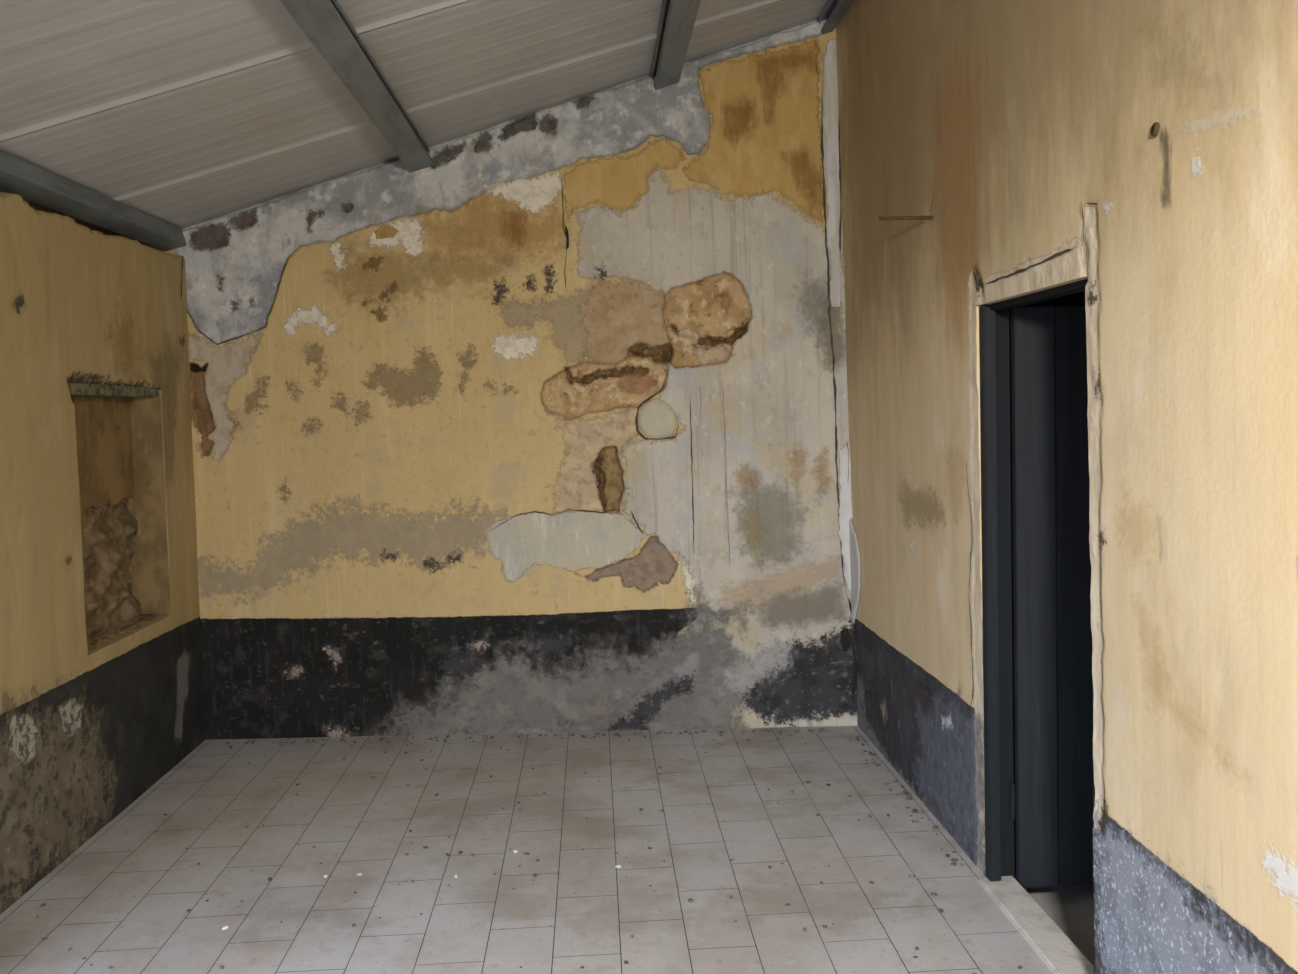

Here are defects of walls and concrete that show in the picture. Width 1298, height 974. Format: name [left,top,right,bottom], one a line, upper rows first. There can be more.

flaking render [175,19,828,462]
flaking render [67,371,163,401]
water stain [198,498,507,604]
peeling [375,39,1279,974]
water stain [175,655,189,738]
peeling [1263,848,1298,903]